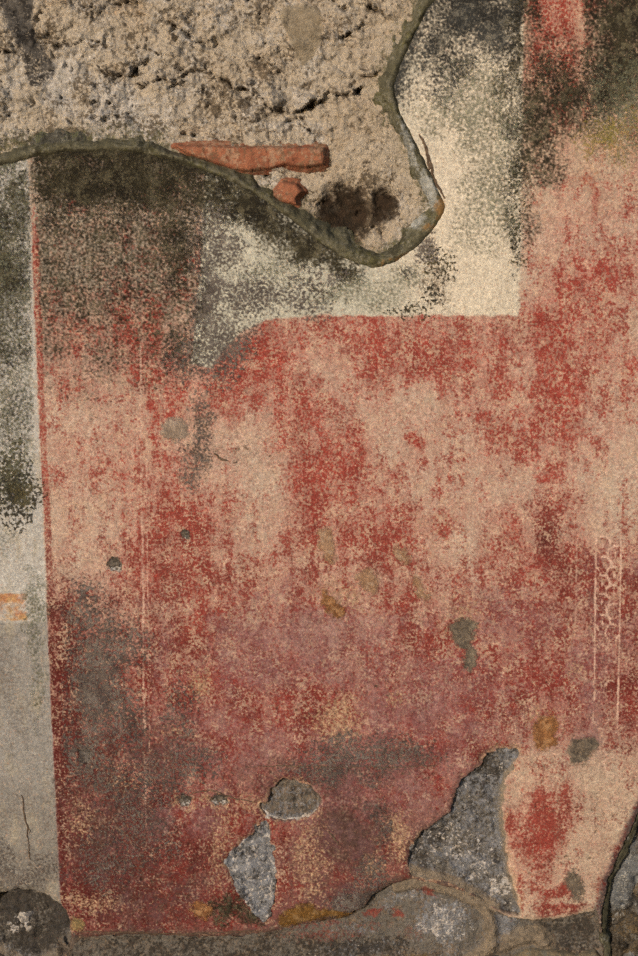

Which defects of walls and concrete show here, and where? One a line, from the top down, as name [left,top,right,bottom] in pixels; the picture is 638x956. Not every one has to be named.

peeling [0,0,445,268]
peeling [0,748,638,956]